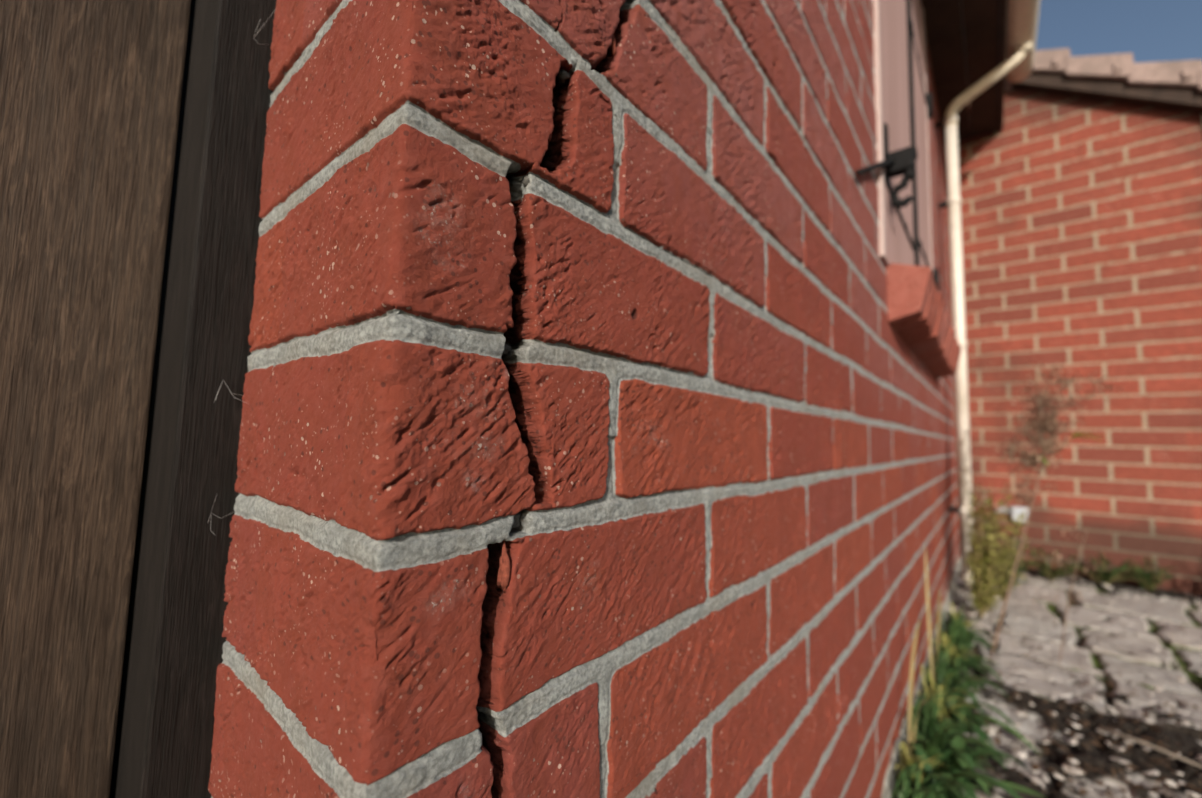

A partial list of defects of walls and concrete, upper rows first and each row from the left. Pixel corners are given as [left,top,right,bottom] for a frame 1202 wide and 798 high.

crack [475,0,640,798]